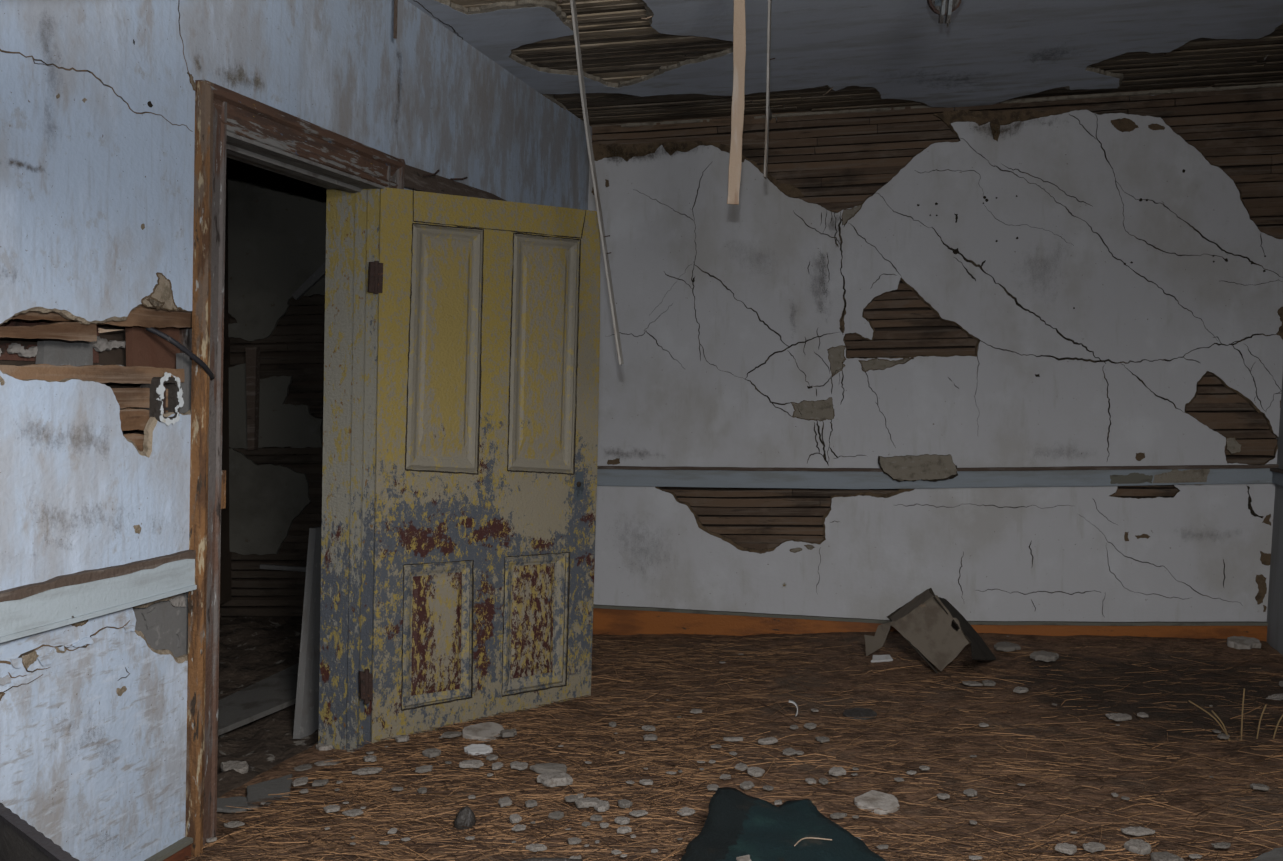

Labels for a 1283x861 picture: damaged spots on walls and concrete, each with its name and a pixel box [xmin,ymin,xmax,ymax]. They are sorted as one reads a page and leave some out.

crack [0,49,193,132]
spalling [435,0,1283,239]
spalling [0,272,192,458]
spalling [827,277,980,377]
crack [607,114,1283,466]
spalling [1185,371,1278,465]
spalling [655,456,958,554]
peeling [1109,452,1210,499]
crack [0,620,130,692]
spalling [123,591,189,663]